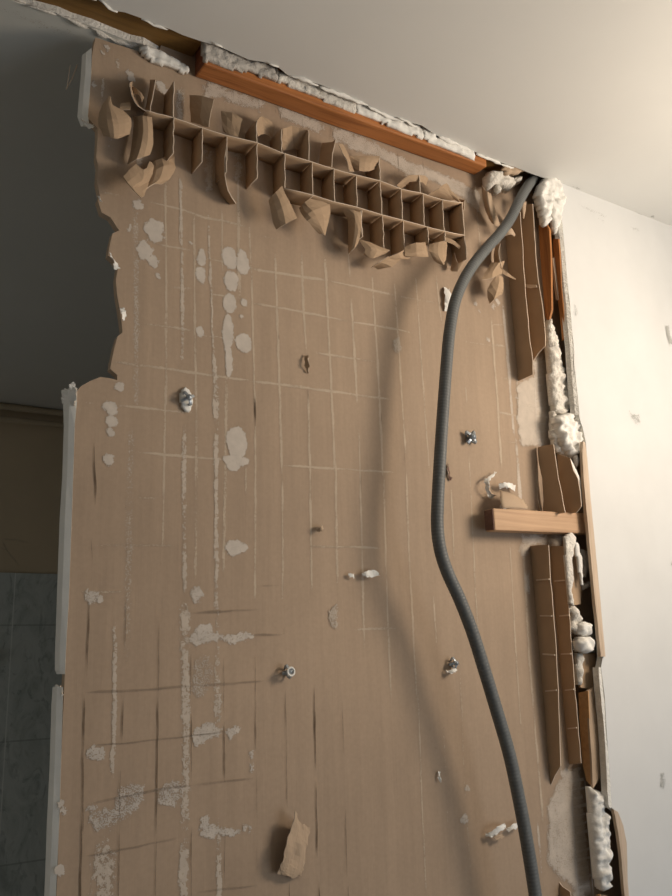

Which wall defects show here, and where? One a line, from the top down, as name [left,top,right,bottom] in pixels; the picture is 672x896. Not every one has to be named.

flaking render [201,42,514,169]